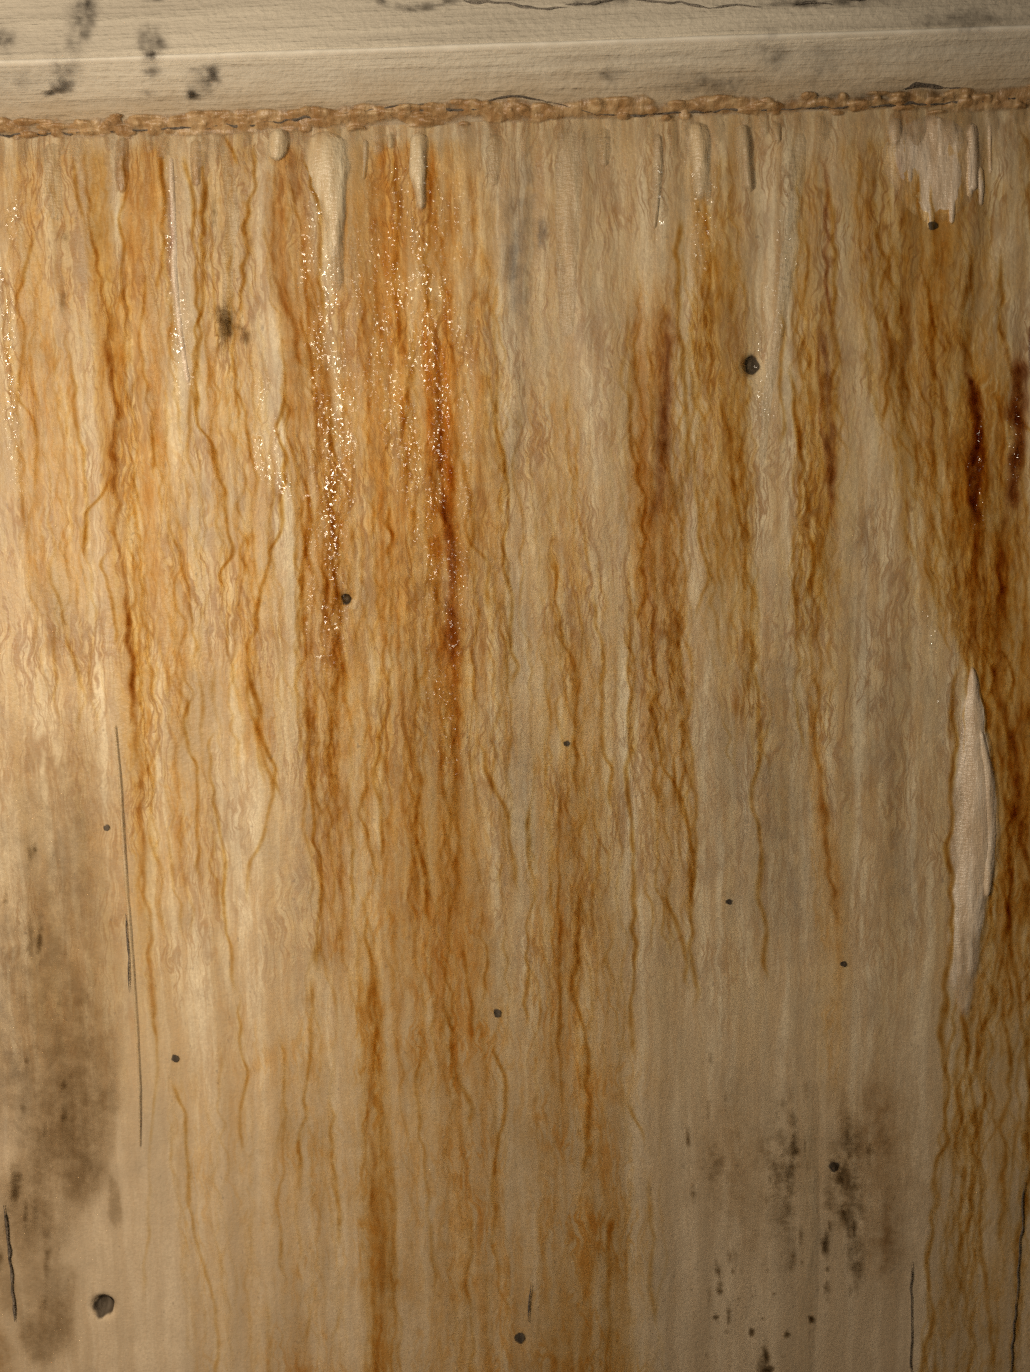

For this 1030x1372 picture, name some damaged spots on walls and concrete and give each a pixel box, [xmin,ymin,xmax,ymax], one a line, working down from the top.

corrosion [968,378,980,512]
corrosion [1008,363,1026,501]
damp [949,668,1000,985]
damp [114,727,141,1146]
crack [3,1205,15,1322]